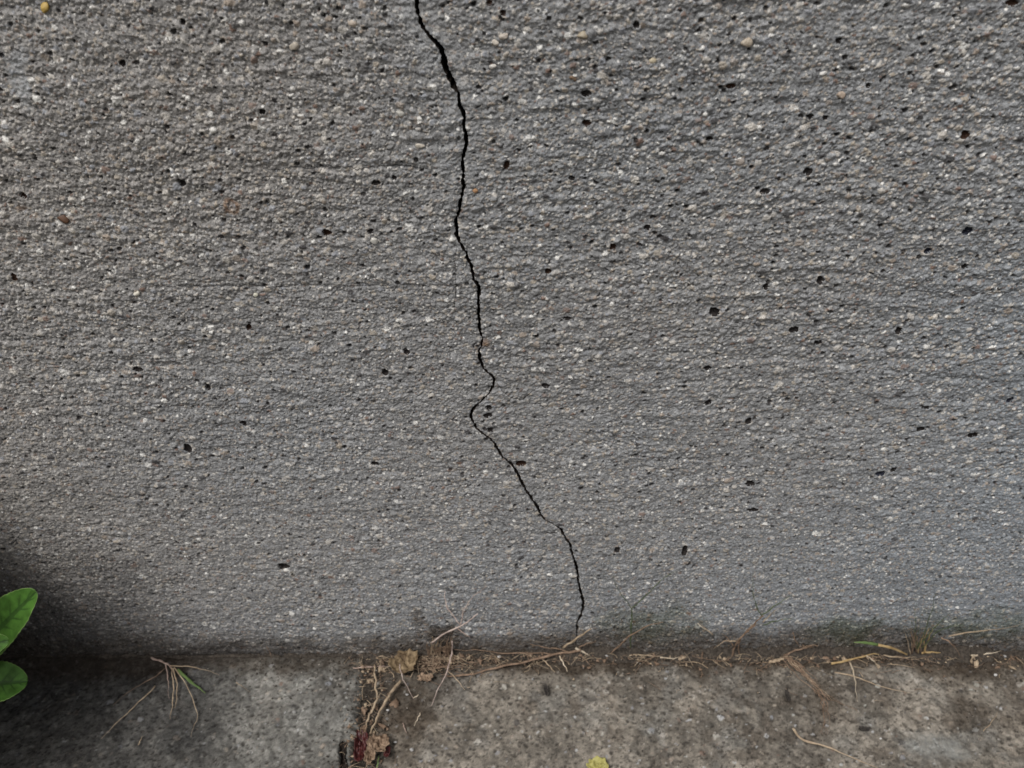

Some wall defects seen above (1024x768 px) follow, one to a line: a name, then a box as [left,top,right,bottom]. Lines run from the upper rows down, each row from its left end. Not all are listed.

crack [144,0,585,642]